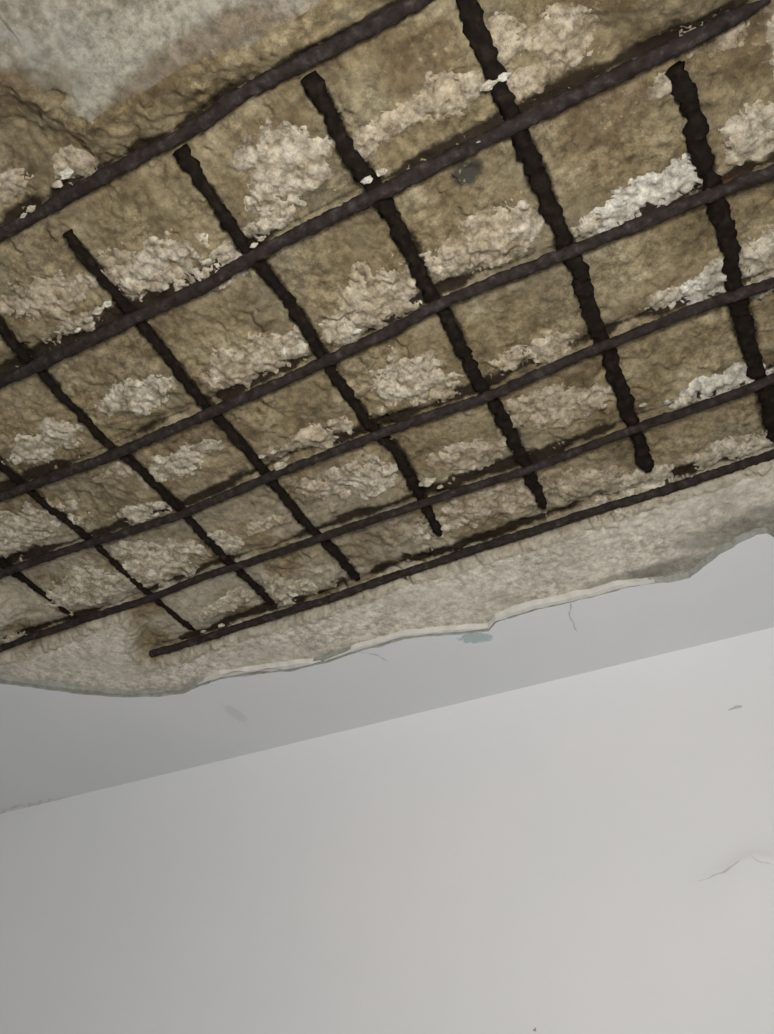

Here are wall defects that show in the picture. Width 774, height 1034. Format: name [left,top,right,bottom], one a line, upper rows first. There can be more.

crack [0,17,23,49]
damp [453,161,481,184]
spalling [0,0,774,696]